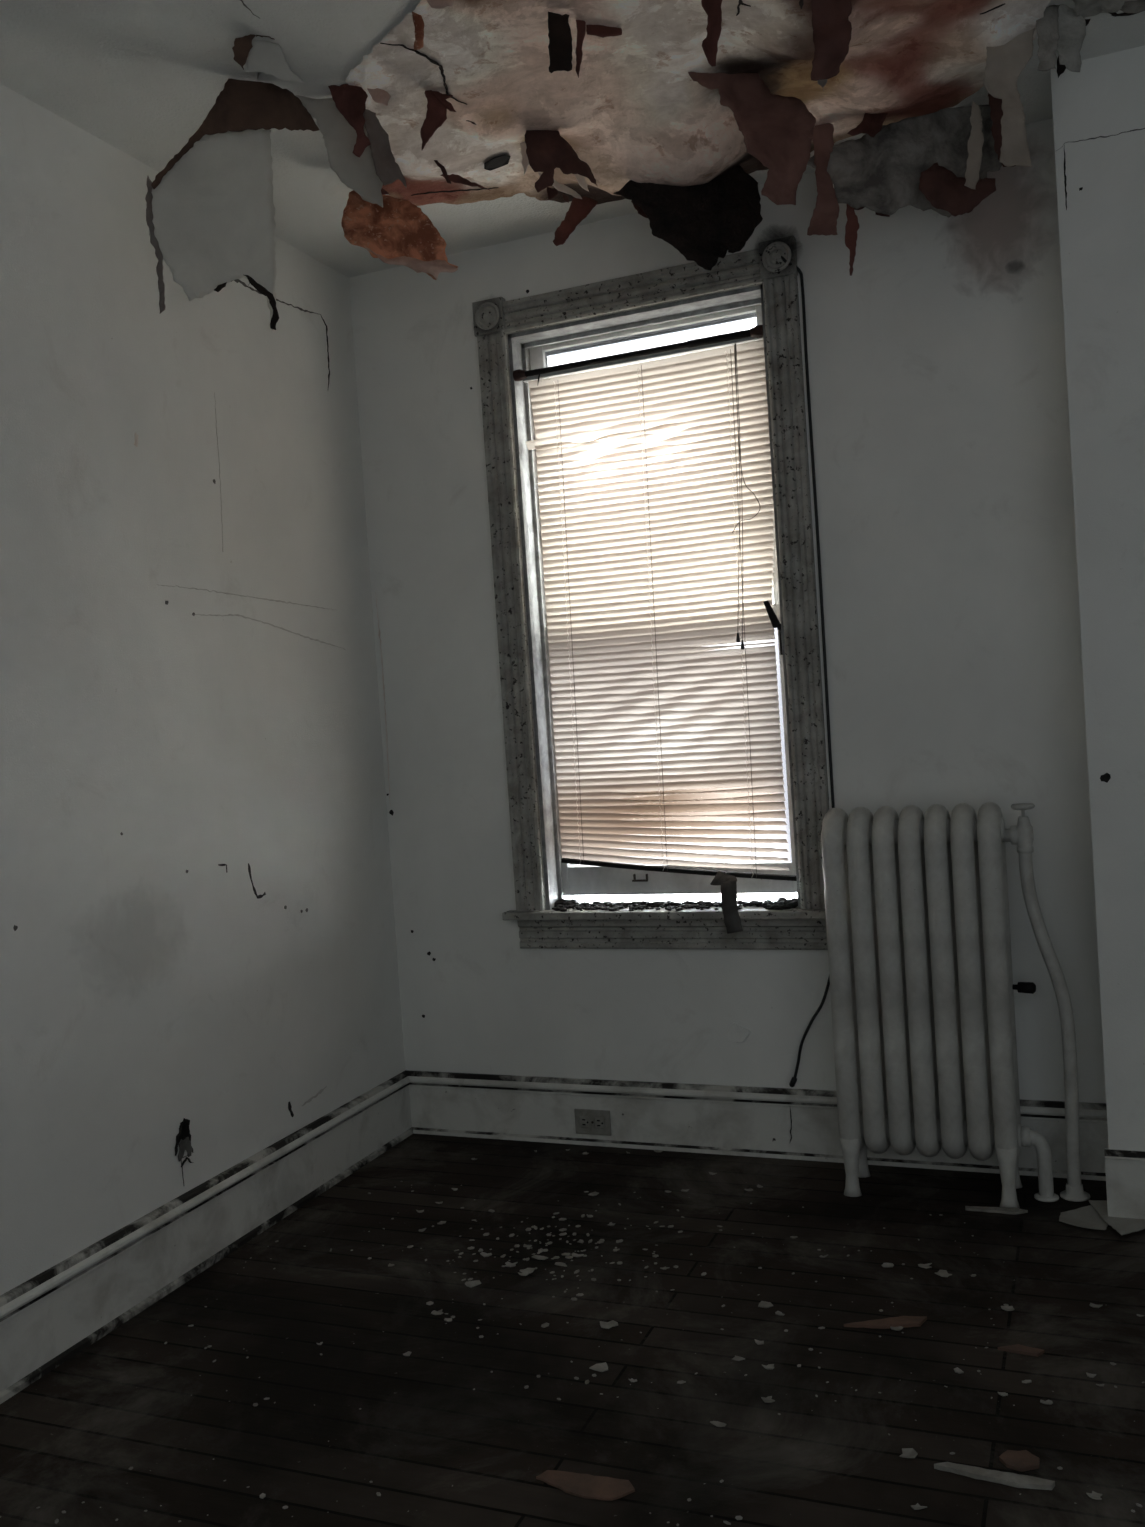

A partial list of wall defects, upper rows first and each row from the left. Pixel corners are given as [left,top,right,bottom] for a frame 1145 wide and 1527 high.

flaking render [807,0,1145,276]
crack [230,279,330,388]
spalling [175,1118,194,1184]